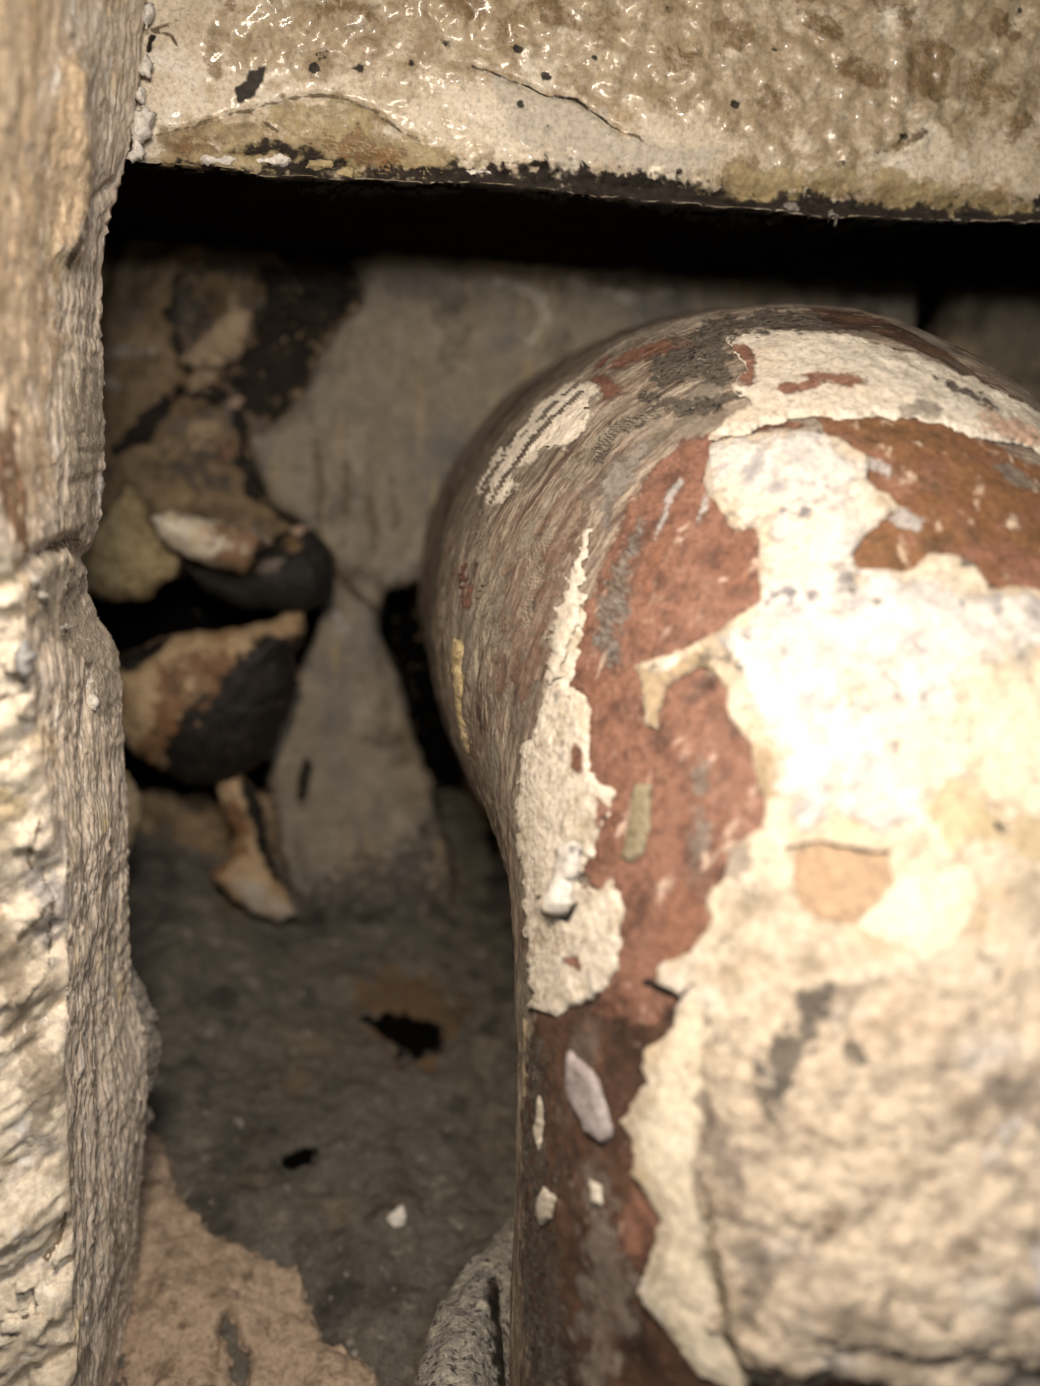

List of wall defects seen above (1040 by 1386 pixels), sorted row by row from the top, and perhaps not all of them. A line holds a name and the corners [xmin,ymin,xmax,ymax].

crack [472,66,643,141]
water stain [156,0,1040,218]
corrosion [591,338,691,399]
corrosion [811,307,990,386]
corrosion [458,563,472,609]
corrosion [492,491,589,710]
corrosion [757,415,1040,591]
corrosion [518,433,766,1386]
peeling [471,329,1040,1386]
crack [43,1211,67,1262]